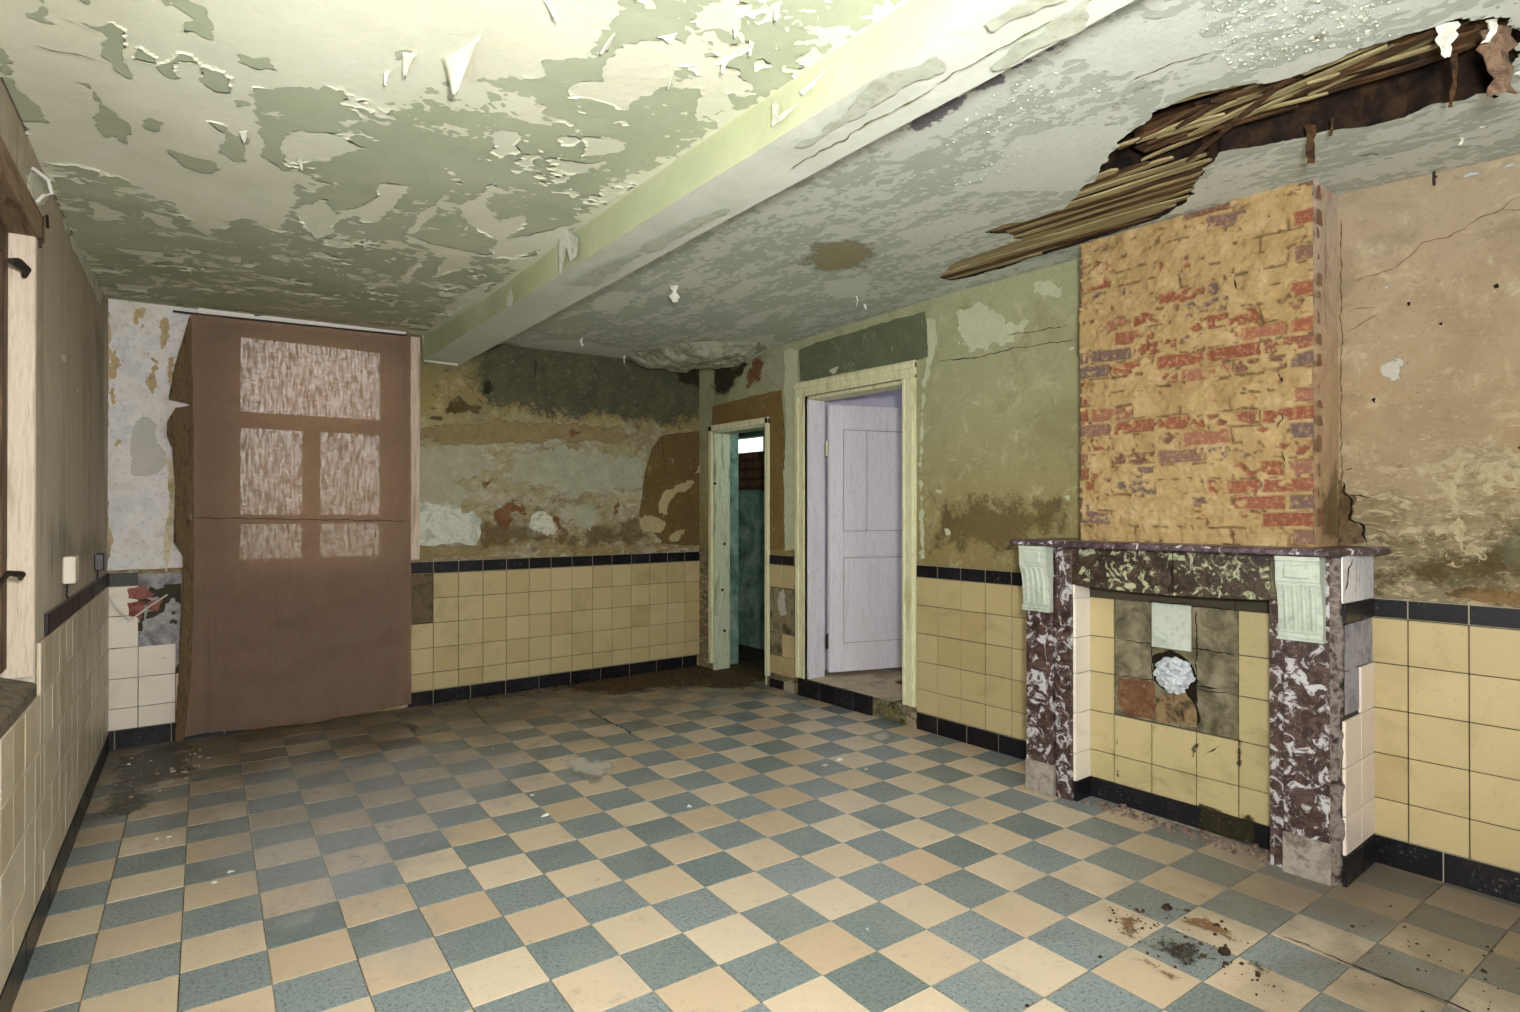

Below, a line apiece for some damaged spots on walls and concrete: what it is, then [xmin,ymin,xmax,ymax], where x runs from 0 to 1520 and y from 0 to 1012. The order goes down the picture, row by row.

peeling [0,48,49,130]
crack [793,21,1051,168]
peeling [26,0,902,447]
water stain [799,240,873,271]
peeling [501,0,1520,568]
crack [1324,198,1520,595]
peeling [123,457,183,677]
flaking render [411,418,647,623]
water stain [1373,534,1520,592]
peeling [1115,600,1239,740]